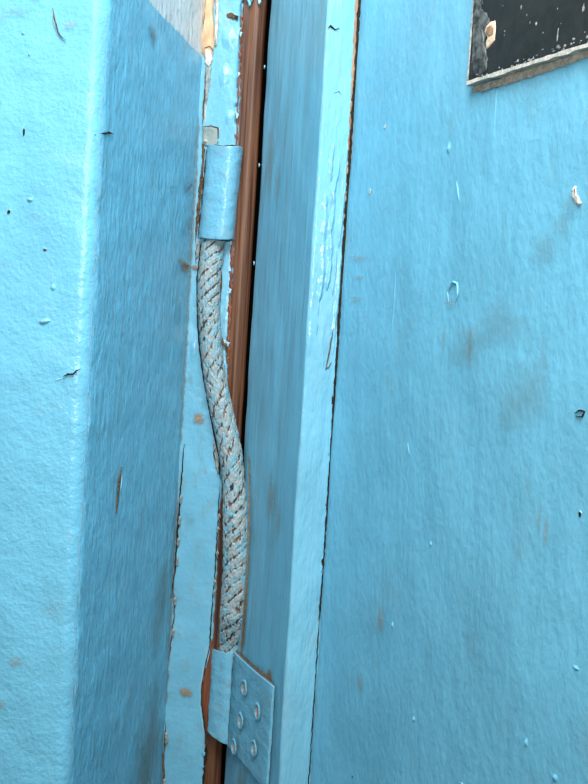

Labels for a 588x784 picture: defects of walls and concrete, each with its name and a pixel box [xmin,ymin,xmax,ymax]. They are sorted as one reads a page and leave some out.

flaking render [202,0,261,144]
crack [304,0,361,784]
crack [169,444,185,656]
crack [161,723,169,784]